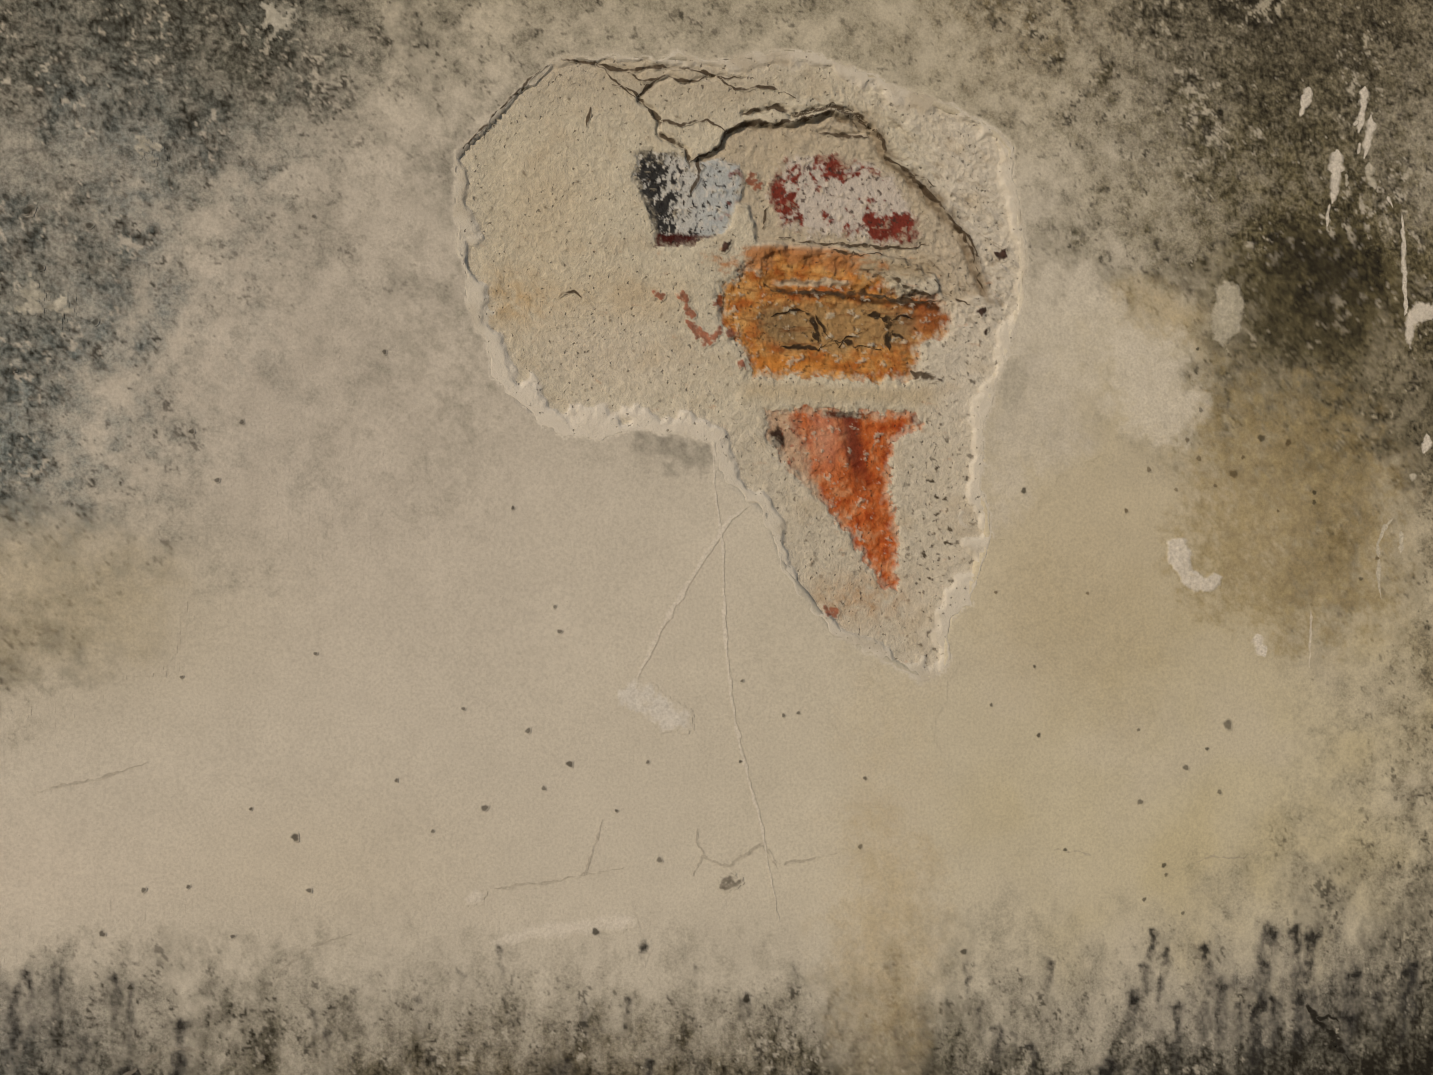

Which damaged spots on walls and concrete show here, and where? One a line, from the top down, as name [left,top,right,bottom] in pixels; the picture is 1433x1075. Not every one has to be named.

leakage [0,0,1433,718]
crack [463,58,988,384]
flaking render [454,51,1028,682]
peeling [1403,299,1433,351]
leakage [932,234,1433,1075]
leakage [0,871,830,1075]
crack [491,819,625,890]
crack [693,828,837,876]